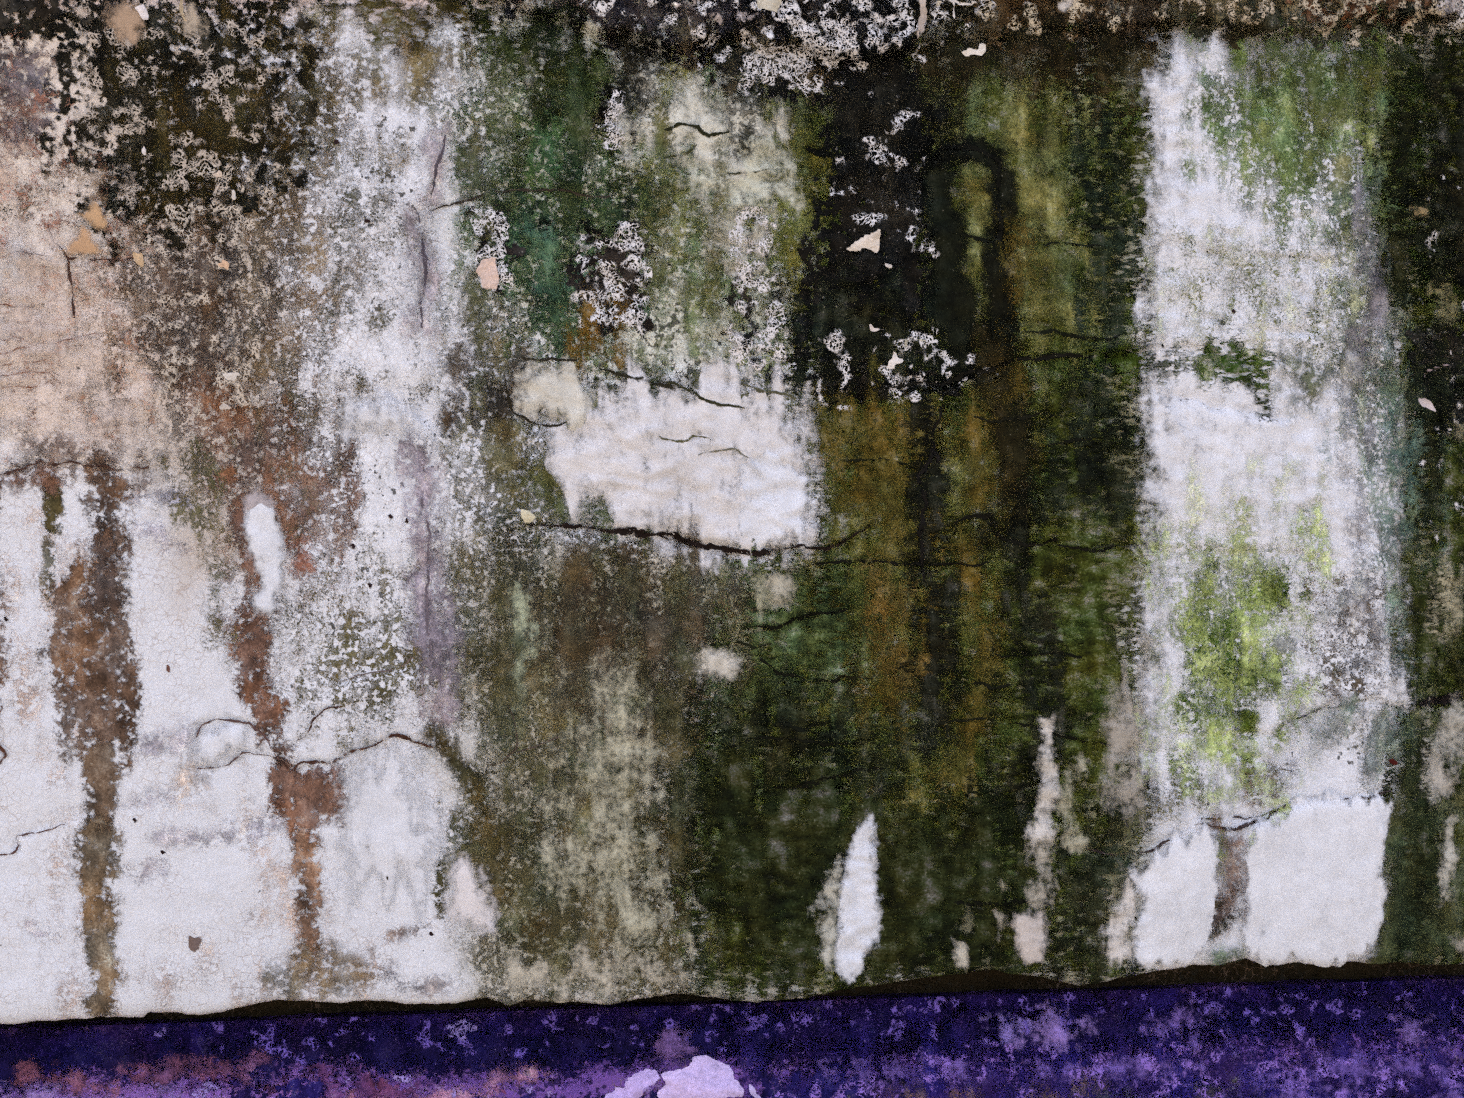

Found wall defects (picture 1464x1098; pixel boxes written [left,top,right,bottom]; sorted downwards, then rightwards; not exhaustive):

damp [455,0,595,244]
crack [664,122,730,158]
crack [806,146,831,157]
crack [504,313,1291,581]
damp [604,0,1464,970]
rust [285,535,316,578]
damp [0,224,1464,1096]
crack [0,698,8,764]
crack [0,824,65,856]
crack [954,899,1051,907]